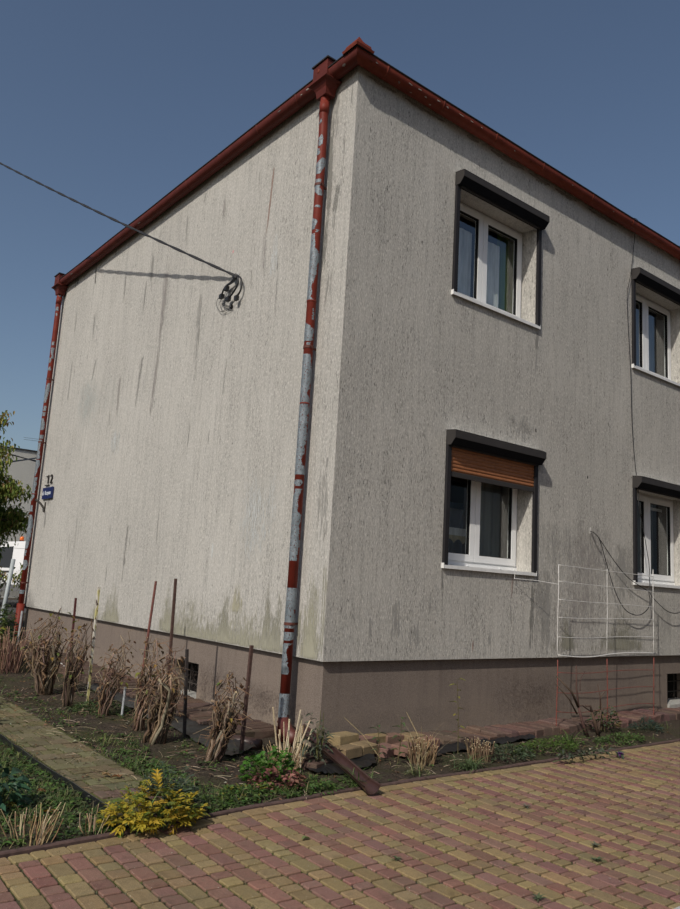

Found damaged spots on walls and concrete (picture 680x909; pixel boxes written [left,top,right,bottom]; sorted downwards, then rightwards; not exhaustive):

peeling [314,118,326,207]
leakage [150,264,169,414]
peeling [289,218,320,561]
peeling [22,477,38,570]
peeling [281,588,297,675]
leakage [529,517,633,653]
peeling [278,693,290,718]